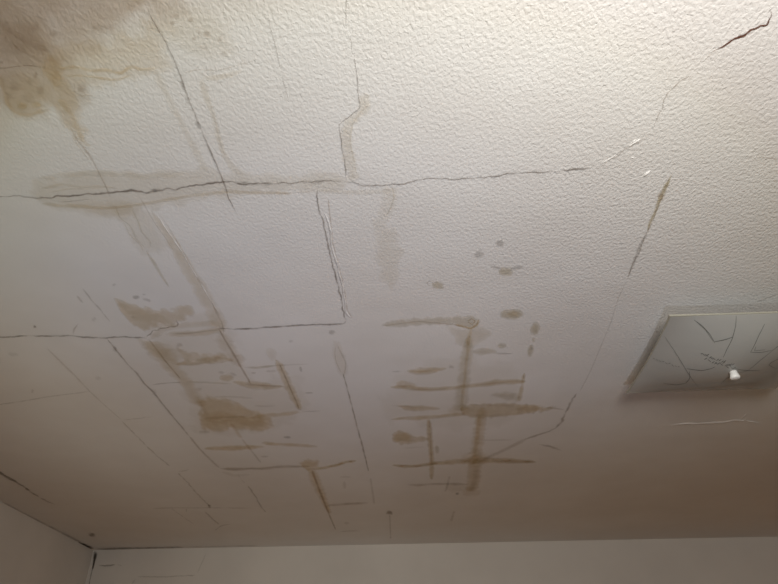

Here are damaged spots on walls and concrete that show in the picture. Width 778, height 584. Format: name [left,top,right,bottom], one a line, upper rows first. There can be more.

crack [716,15,772,50]